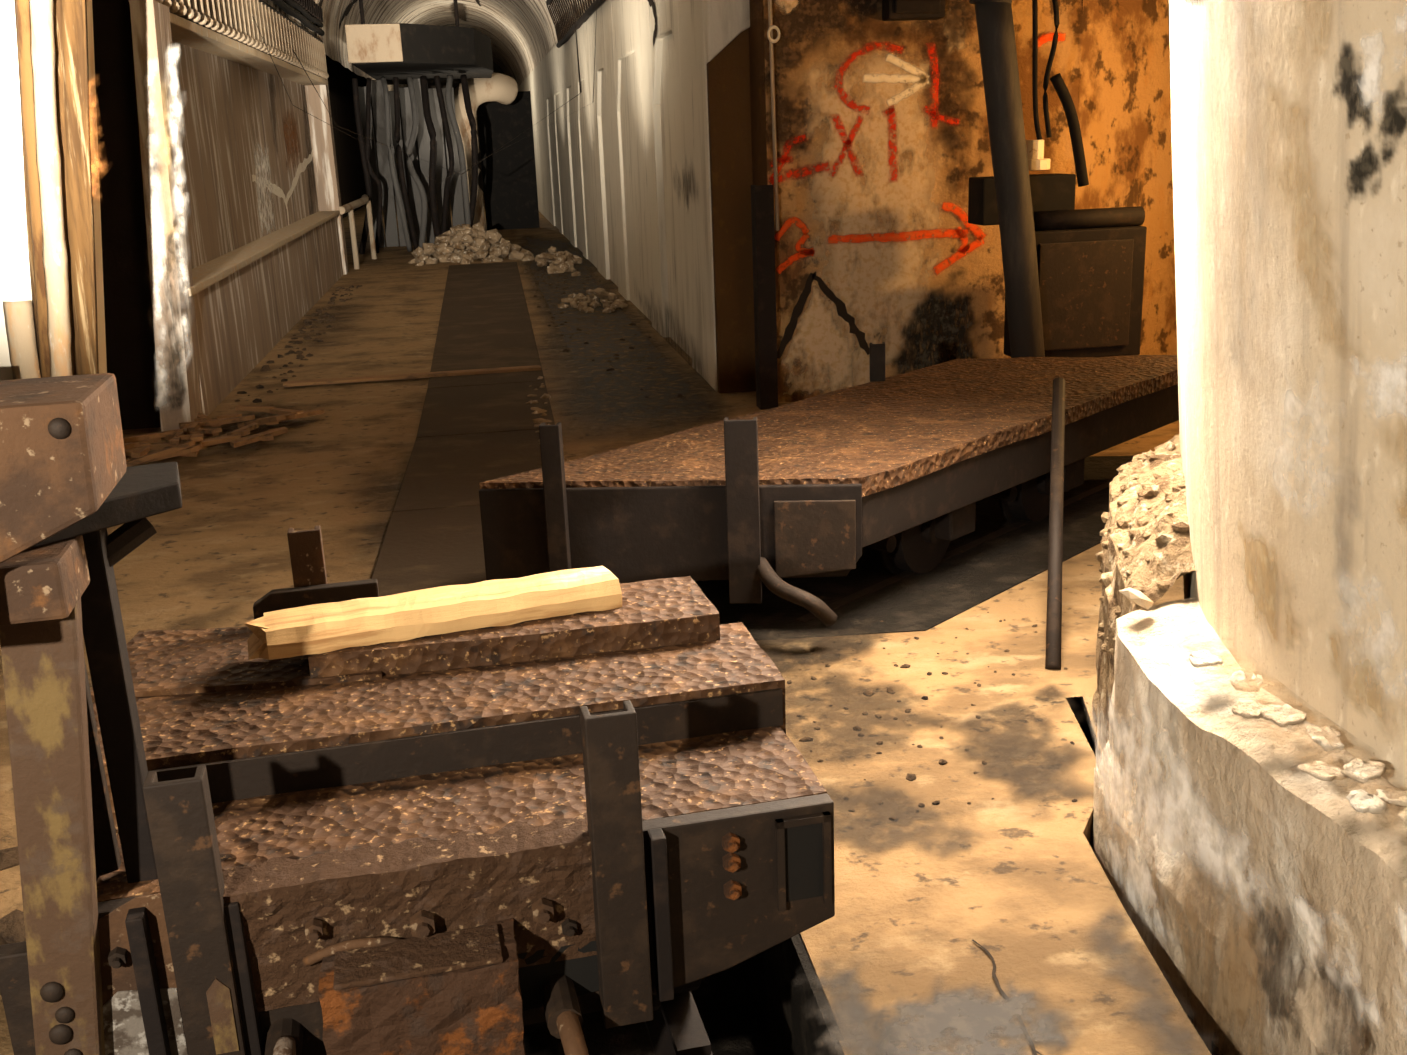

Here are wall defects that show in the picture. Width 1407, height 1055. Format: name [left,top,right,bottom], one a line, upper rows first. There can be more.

water stain [894,293,977,374]
crack [972,940,1042,1055]